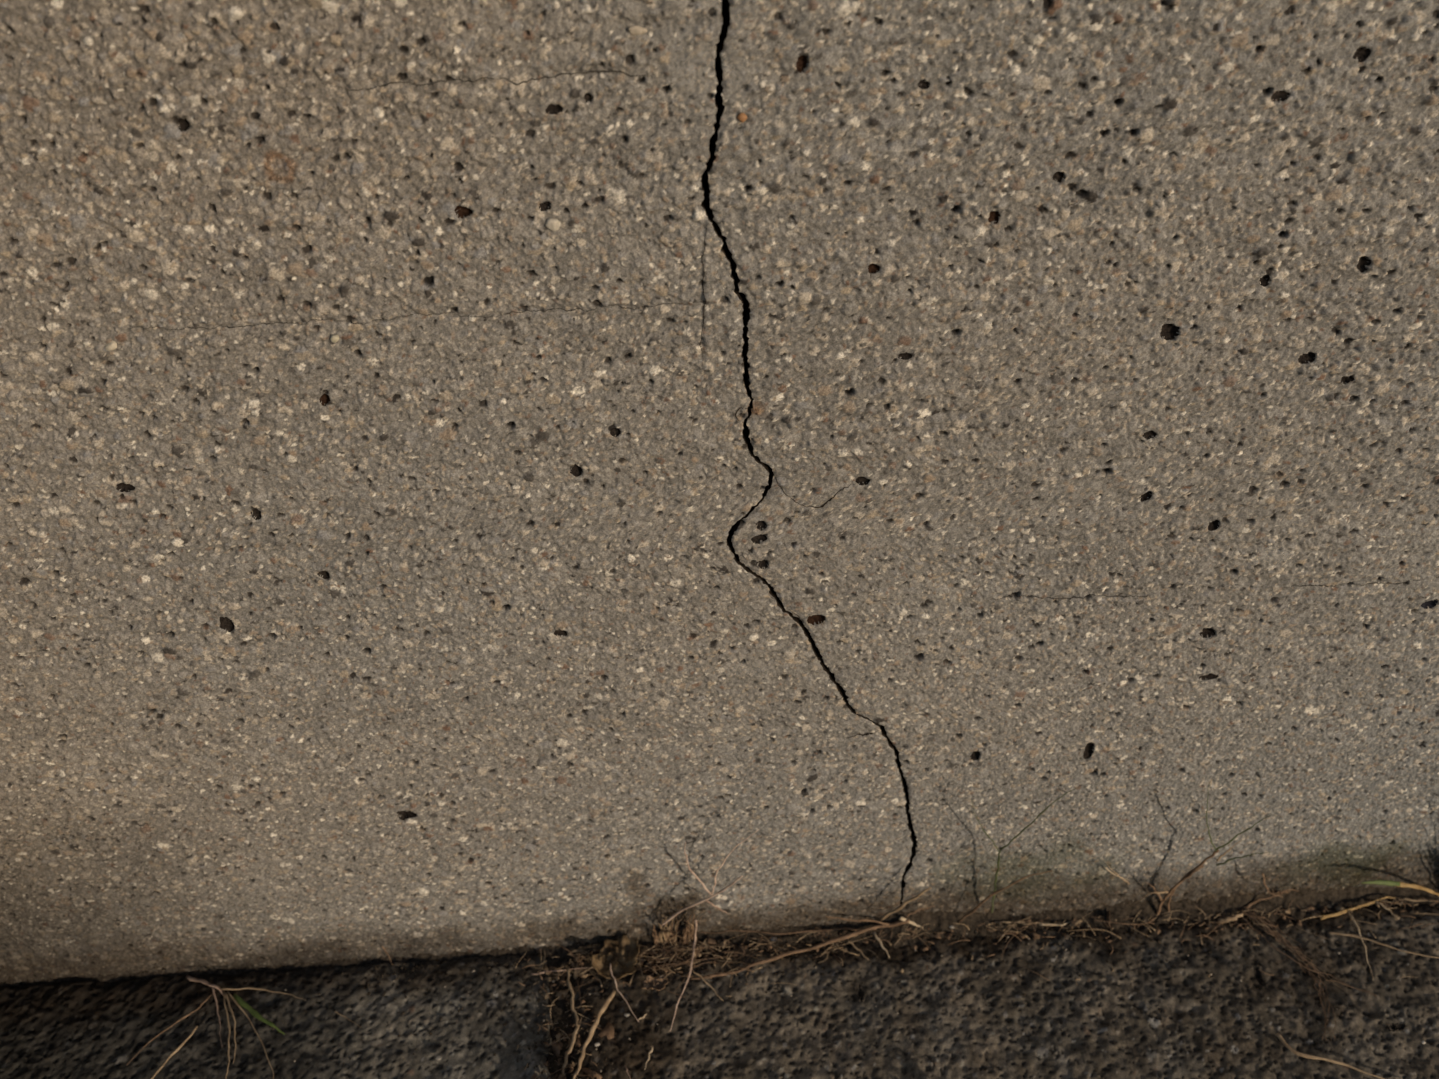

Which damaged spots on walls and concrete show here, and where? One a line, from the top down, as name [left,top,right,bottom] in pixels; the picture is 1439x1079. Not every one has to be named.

crack [130,0,918,905]